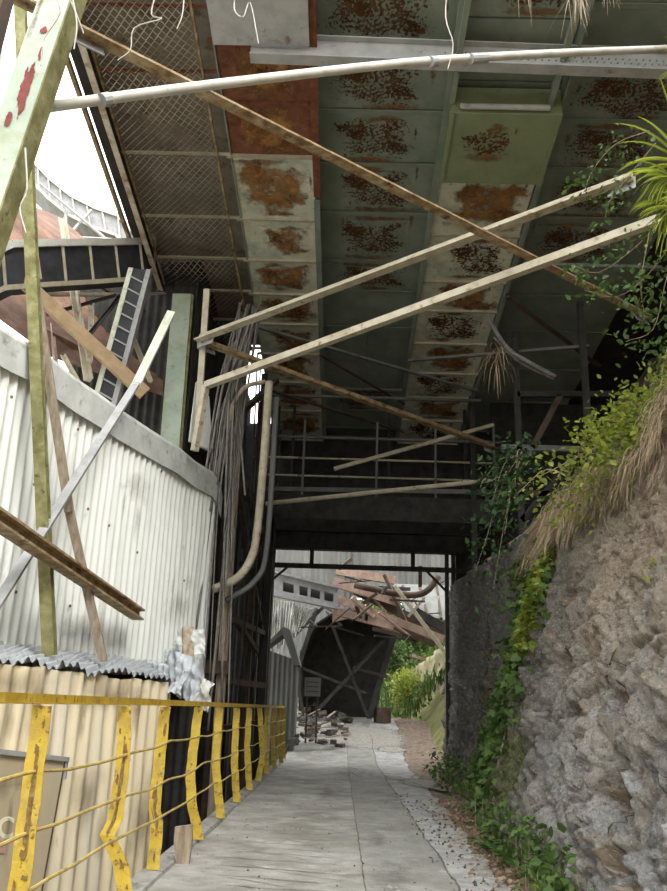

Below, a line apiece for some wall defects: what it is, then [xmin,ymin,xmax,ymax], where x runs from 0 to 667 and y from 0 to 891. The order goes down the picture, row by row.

corrosion [317,0,434,37]
corrosion [236,47,290,96]
corrosion [230,121,311,216]
corrosion [330,69,419,290]
corrosion [461,124,517,161]
corrosion [454,183,528,231]
corrosion [533,77,667,254]
corrosion [562,248,604,262]
corrosion [259,226,318,434]
corrosion [408,239,504,438]